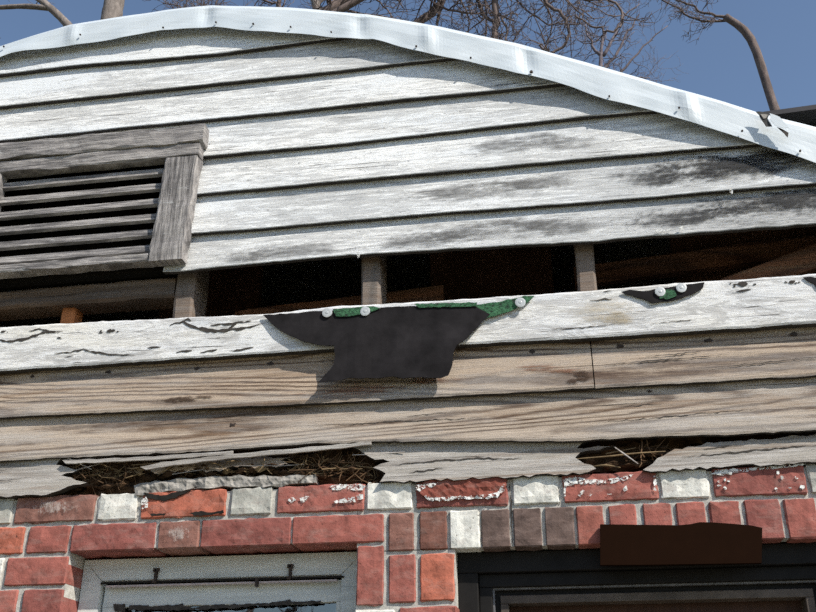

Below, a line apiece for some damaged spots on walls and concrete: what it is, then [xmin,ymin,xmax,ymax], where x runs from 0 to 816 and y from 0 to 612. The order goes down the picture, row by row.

leakage [473,132,591,157]
mould [612,149,806,186]
leakage [425,175,567,201]
mould [622,188,816,227]
leakage [382,217,595,247]
crack [0,318,263,357]
spalling [134,474,319,516]